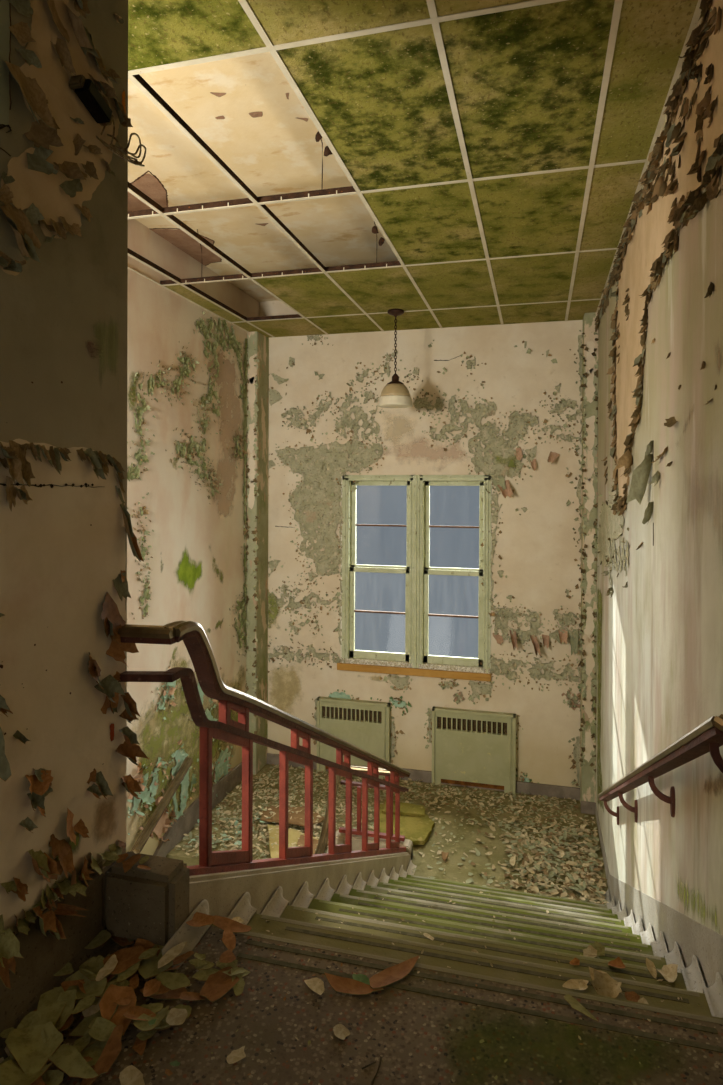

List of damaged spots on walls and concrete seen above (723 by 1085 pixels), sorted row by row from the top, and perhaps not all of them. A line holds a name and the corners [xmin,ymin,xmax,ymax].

crack [0,11,12,156]
peeling [0,0,133,276]
spalling [128,171,168,211]
spalling [150,228,222,266]
peeling [268,0,723,787]
peeling [0,311,283,989]
peeling [212,739,609,905]